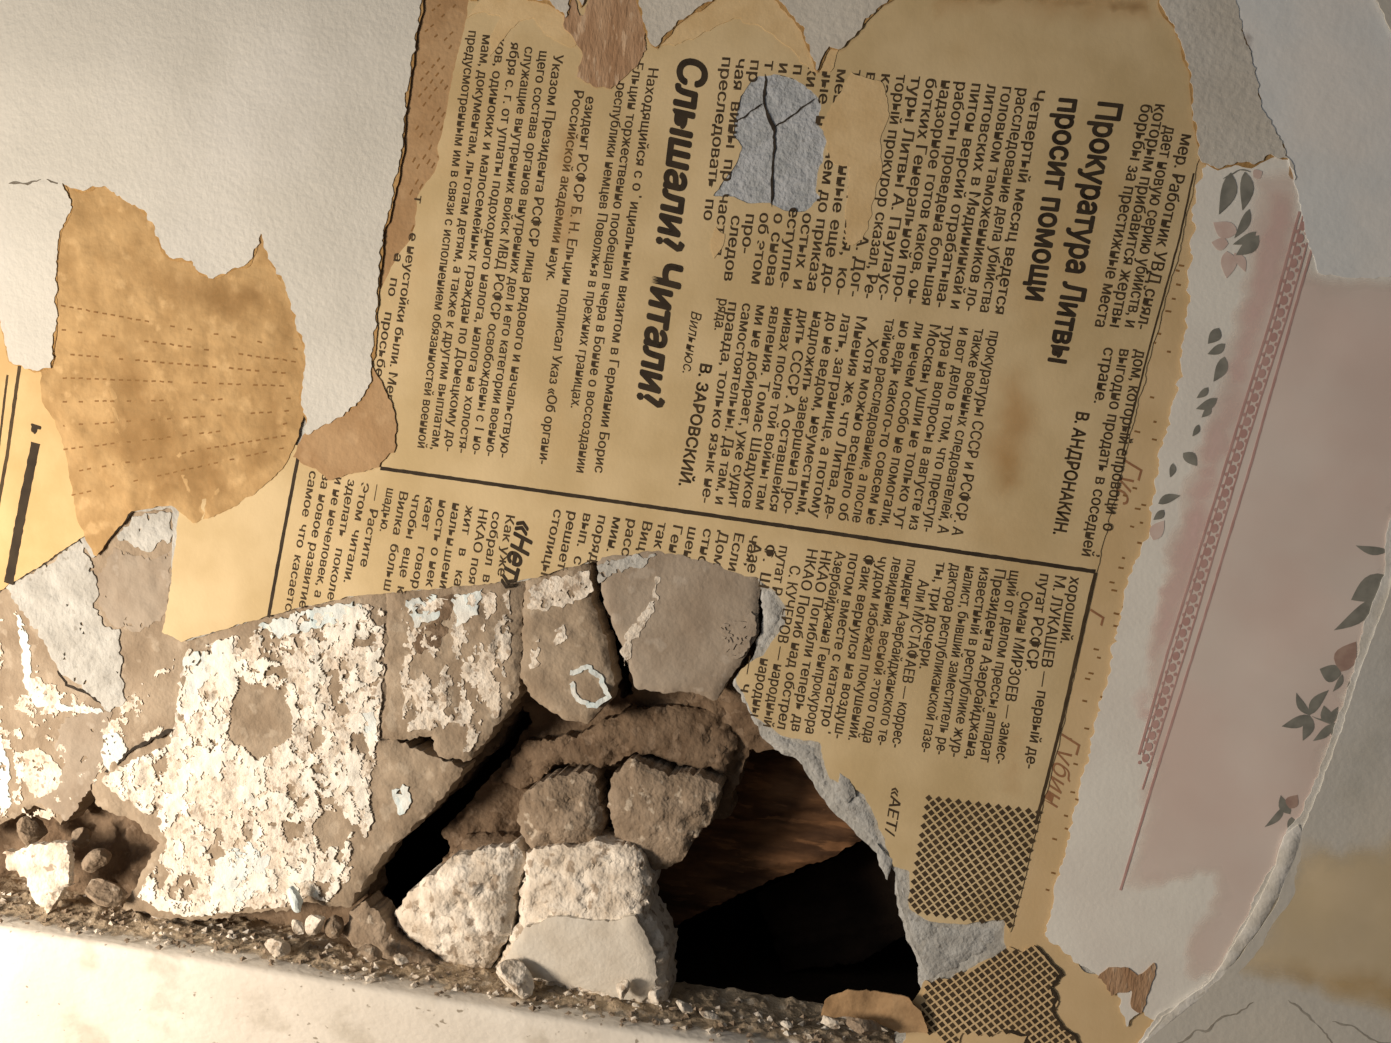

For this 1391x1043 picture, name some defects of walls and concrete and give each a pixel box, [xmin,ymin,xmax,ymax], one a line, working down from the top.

crack [9,178,58,186]
crack [735,75,815,206]
peeling [0,570,999,1004]
damp [1248,852,1391,1005]